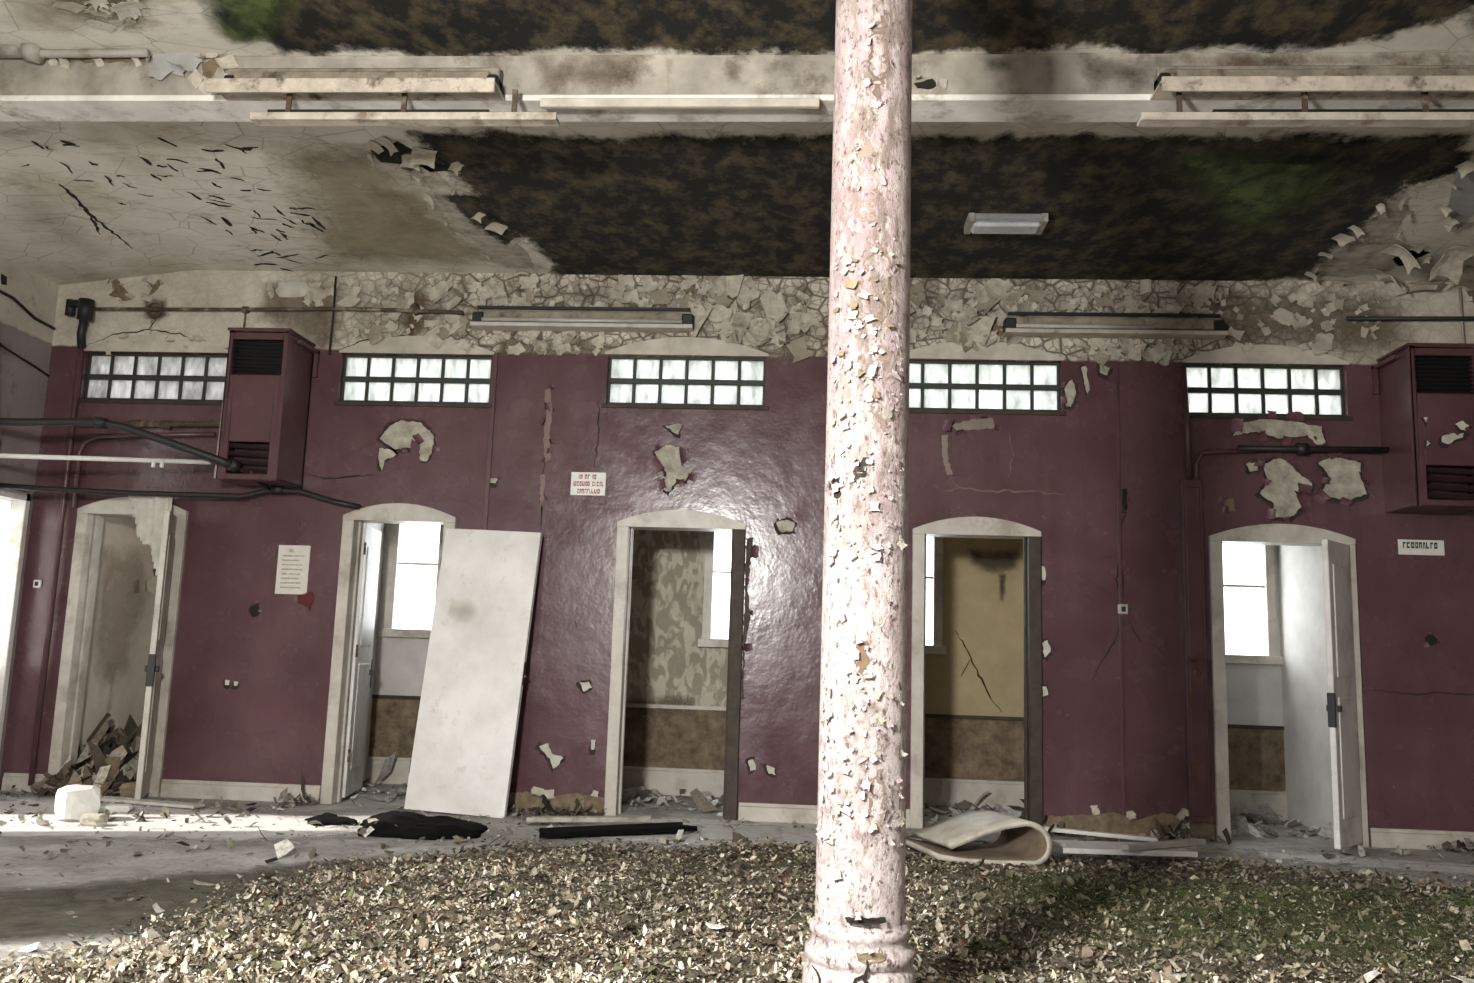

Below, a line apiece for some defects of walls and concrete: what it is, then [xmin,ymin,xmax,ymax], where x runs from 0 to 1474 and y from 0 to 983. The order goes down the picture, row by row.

peeling [53,0,149,33]
spalling [49,52,239,95]
peeling [863,16,894,109]
spalling [914,75,948,90]
damp [295,128,833,277]
damp [910,132,1473,281]
peeling [1066,160,1474,355]
peeling [337,136,1048,846]
peeling [1230,410,1372,524]
peeling [1421,416,1472,450]